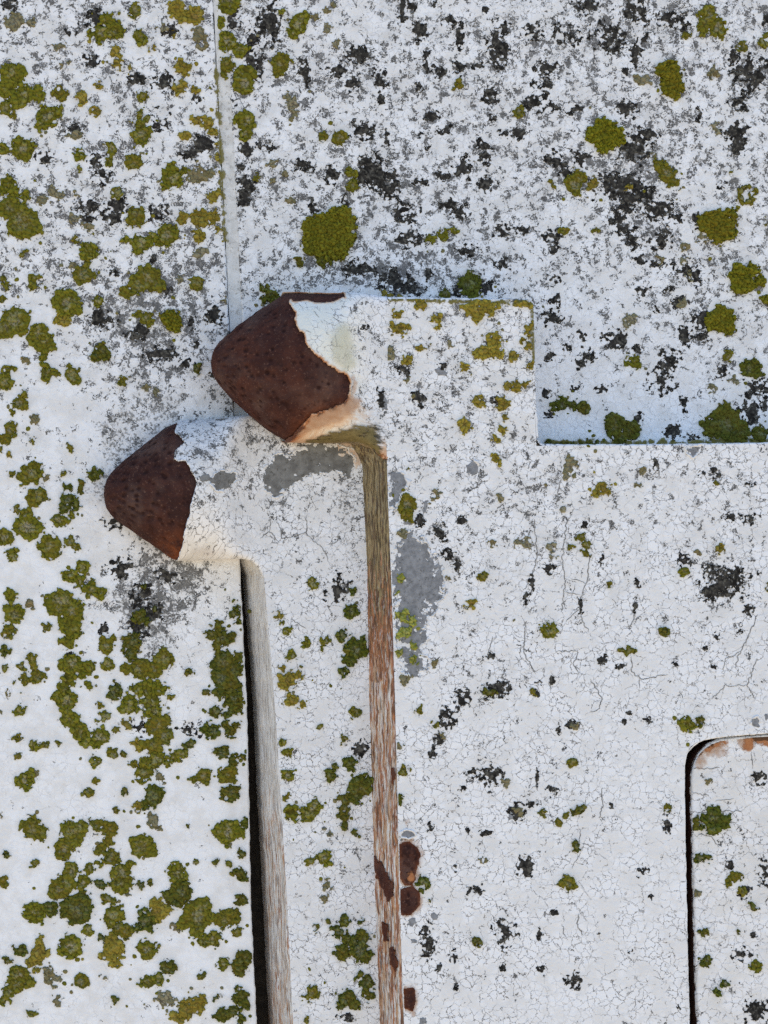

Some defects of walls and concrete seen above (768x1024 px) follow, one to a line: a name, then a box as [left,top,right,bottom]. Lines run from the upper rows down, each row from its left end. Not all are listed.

corrosion [300,376,360,434]
crack [261,515,339,560]
crack [526,479,590,630]
crack [523,622,535,673]
crack [559,650,603,712]
crack [631,658,665,687]
crack [713,614,758,699]
crack [572,789,604,867]
crack [692,767,741,847]
corrosion [374,840,422,916]
corrosion [381,922,398,972]
corrosion [403,987,417,1013]